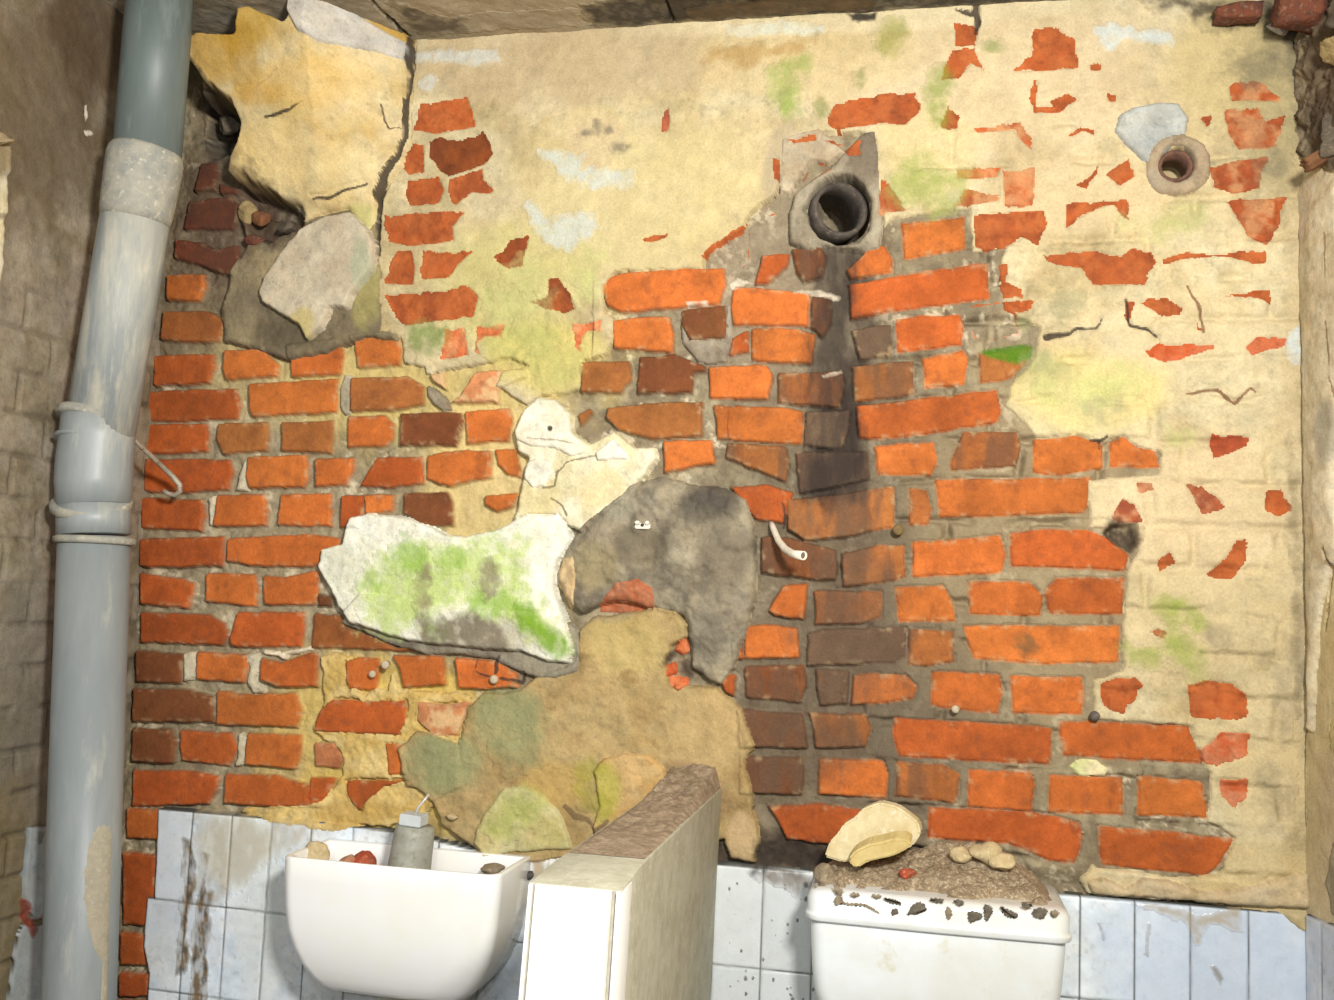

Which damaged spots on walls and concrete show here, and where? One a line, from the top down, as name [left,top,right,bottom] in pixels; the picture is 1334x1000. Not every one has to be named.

crack [312,0,417,257]
efflorescence [792,289,841,302]
peeling [221,0,1334,932]